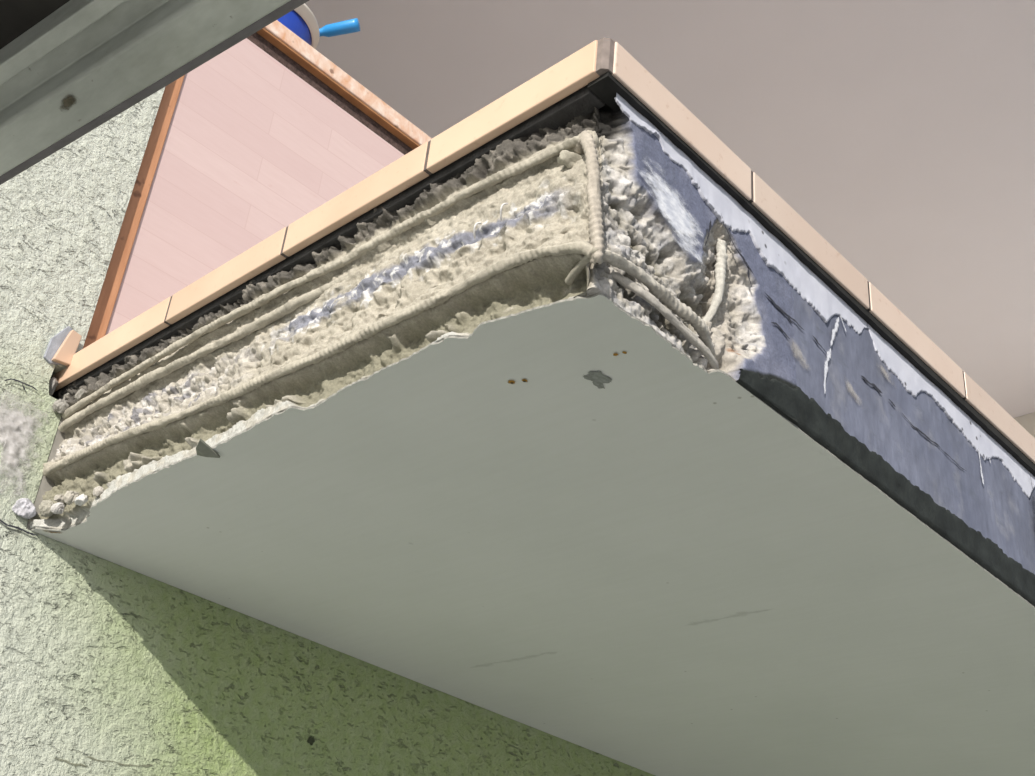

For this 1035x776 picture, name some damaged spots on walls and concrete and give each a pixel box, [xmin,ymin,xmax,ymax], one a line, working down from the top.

crack [0,519,36,536]
spalling [12,93,1035,529]